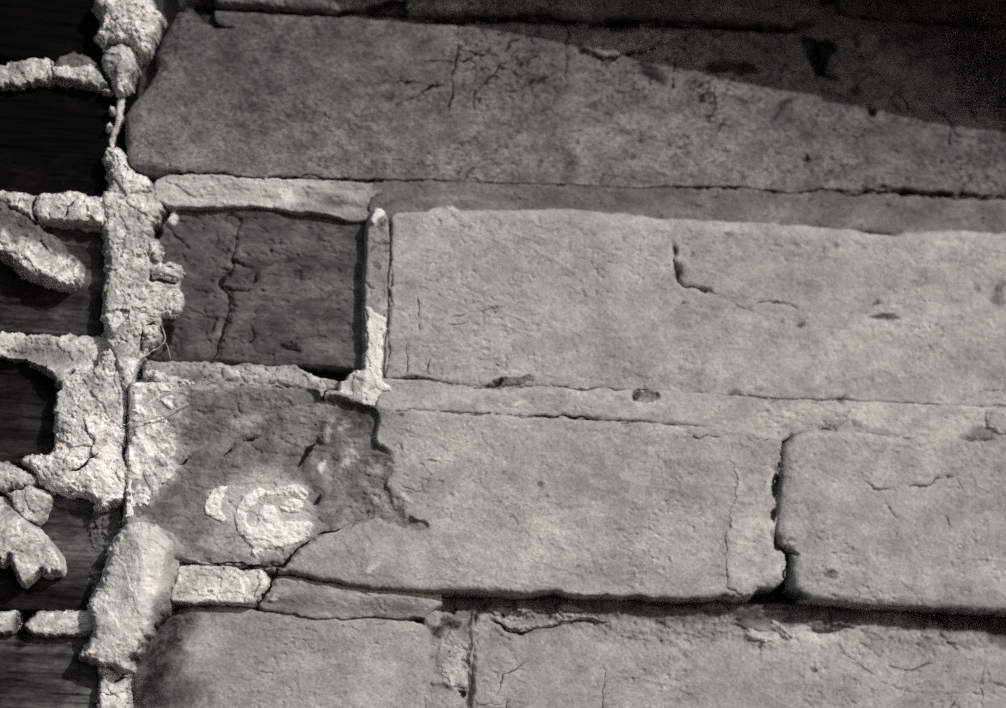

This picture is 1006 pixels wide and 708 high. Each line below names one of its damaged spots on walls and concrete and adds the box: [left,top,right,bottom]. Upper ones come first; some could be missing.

crack [215,8,359,18]
crack [395,15,801,111]
crack [211,214,258,361]
crack [673,245,796,311]
crack [458,608,594,708]